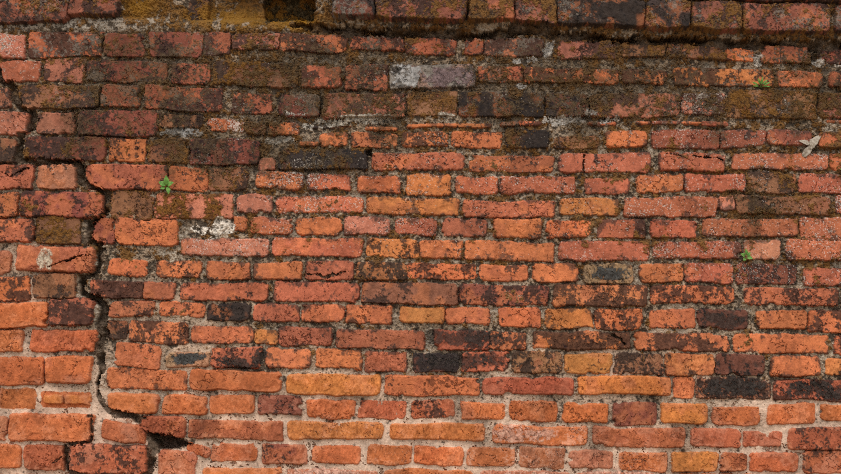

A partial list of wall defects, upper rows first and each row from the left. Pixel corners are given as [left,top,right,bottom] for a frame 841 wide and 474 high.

crack [0,67,165,474]